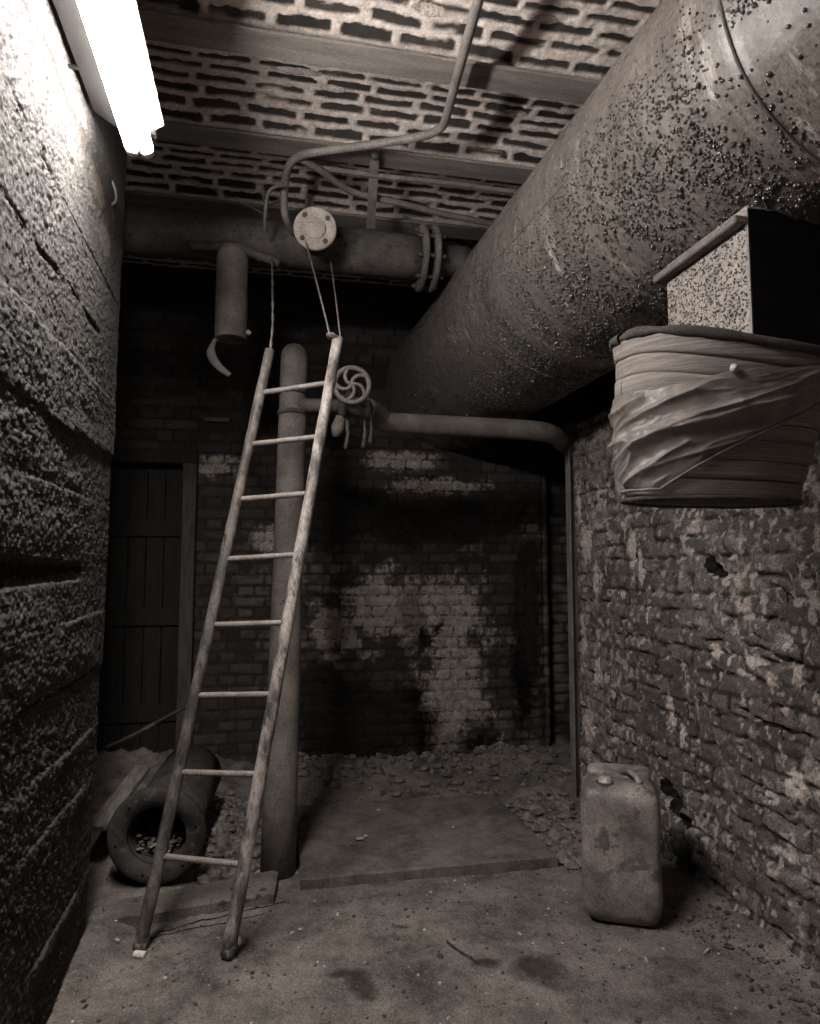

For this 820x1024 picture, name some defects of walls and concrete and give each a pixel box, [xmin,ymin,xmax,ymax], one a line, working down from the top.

crack [0,184,96,331]
crack [48,171,119,307]
spalling [703,555,728,577]
leakage [299,665,435,759]
spalling [660,779,693,829]